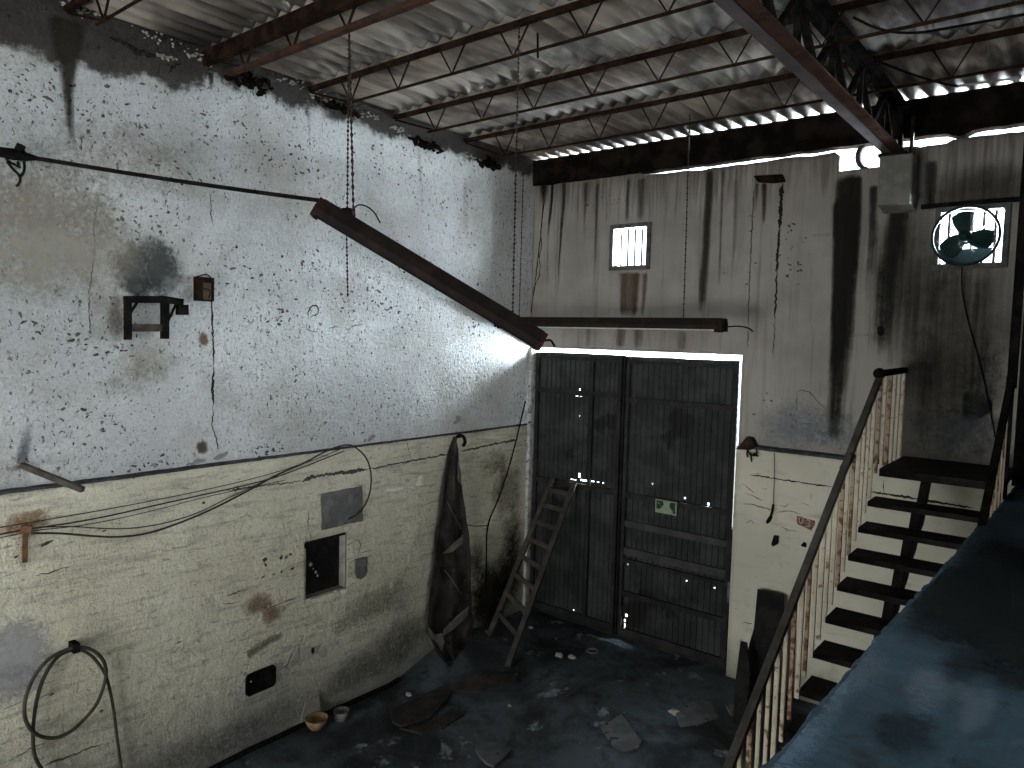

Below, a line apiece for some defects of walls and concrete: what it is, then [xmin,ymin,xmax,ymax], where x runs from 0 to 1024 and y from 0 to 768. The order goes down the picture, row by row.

damp [52,18,83,131]
damp [0,167,182,296]
crack [210,283,218,450]
damp [541,183,566,268]
damp [699,171,723,304]
crack [747,183,784,353]
damp [829,176,908,442]
crack [227,439,515,492]
damp [471,454,521,625]
crack [743,475,831,531]
corrosion [248,596,278,620]